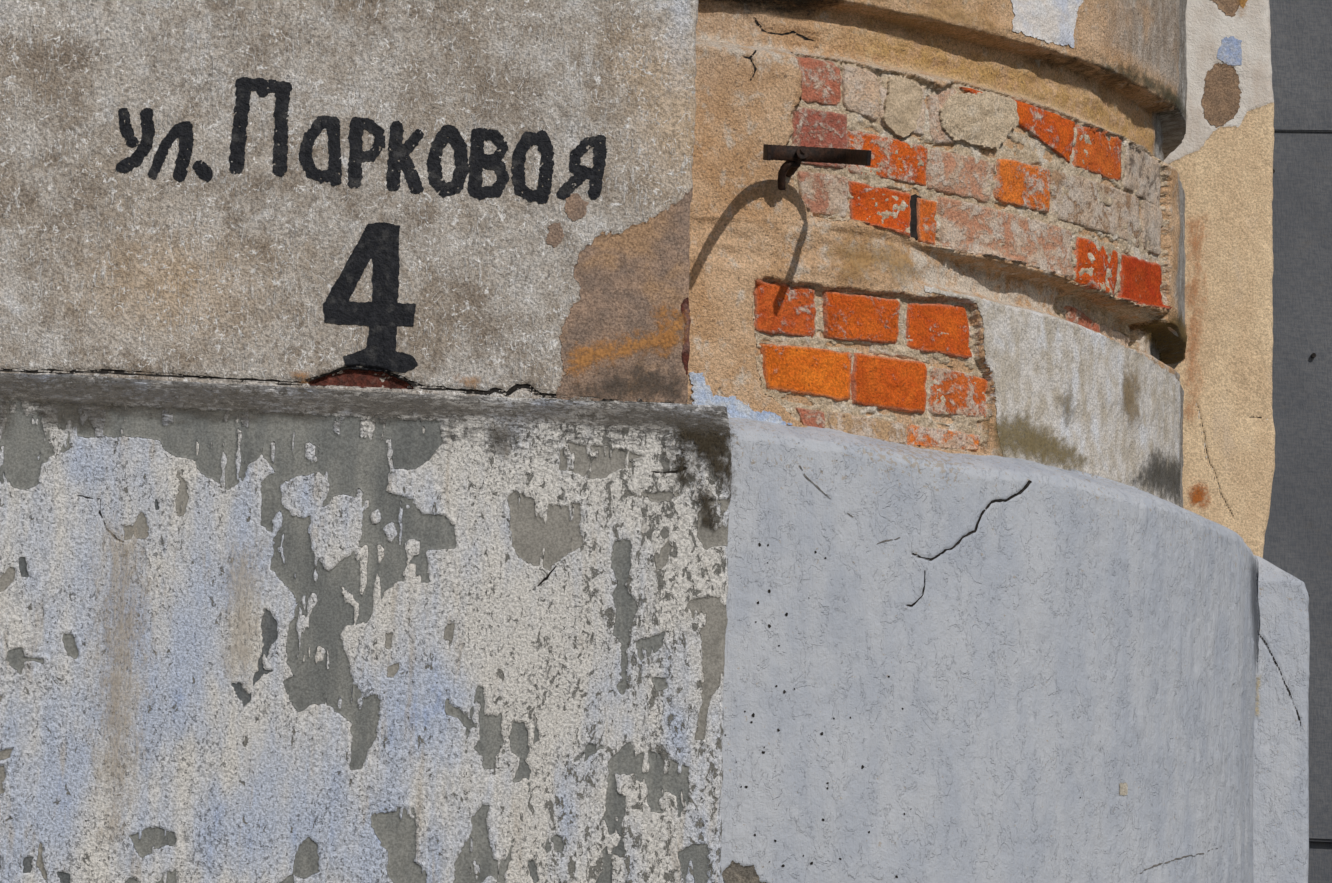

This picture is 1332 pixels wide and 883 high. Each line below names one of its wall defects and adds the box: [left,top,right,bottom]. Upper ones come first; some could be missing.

peeling [556,188,693,404]
flaking render [752,54,1275,558]
peeling [0,399,457,770]
peeling [445,686,539,792]
peeling [508,491,583,570]
peeling [611,539,665,694]
peeling [686,596,728,740]
crack [799,465,853,517]
crack [877,480,1032,607]
crack [1257,630,1301,725]
peeling [454,804,514,883]
peeling [574,742,690,883]